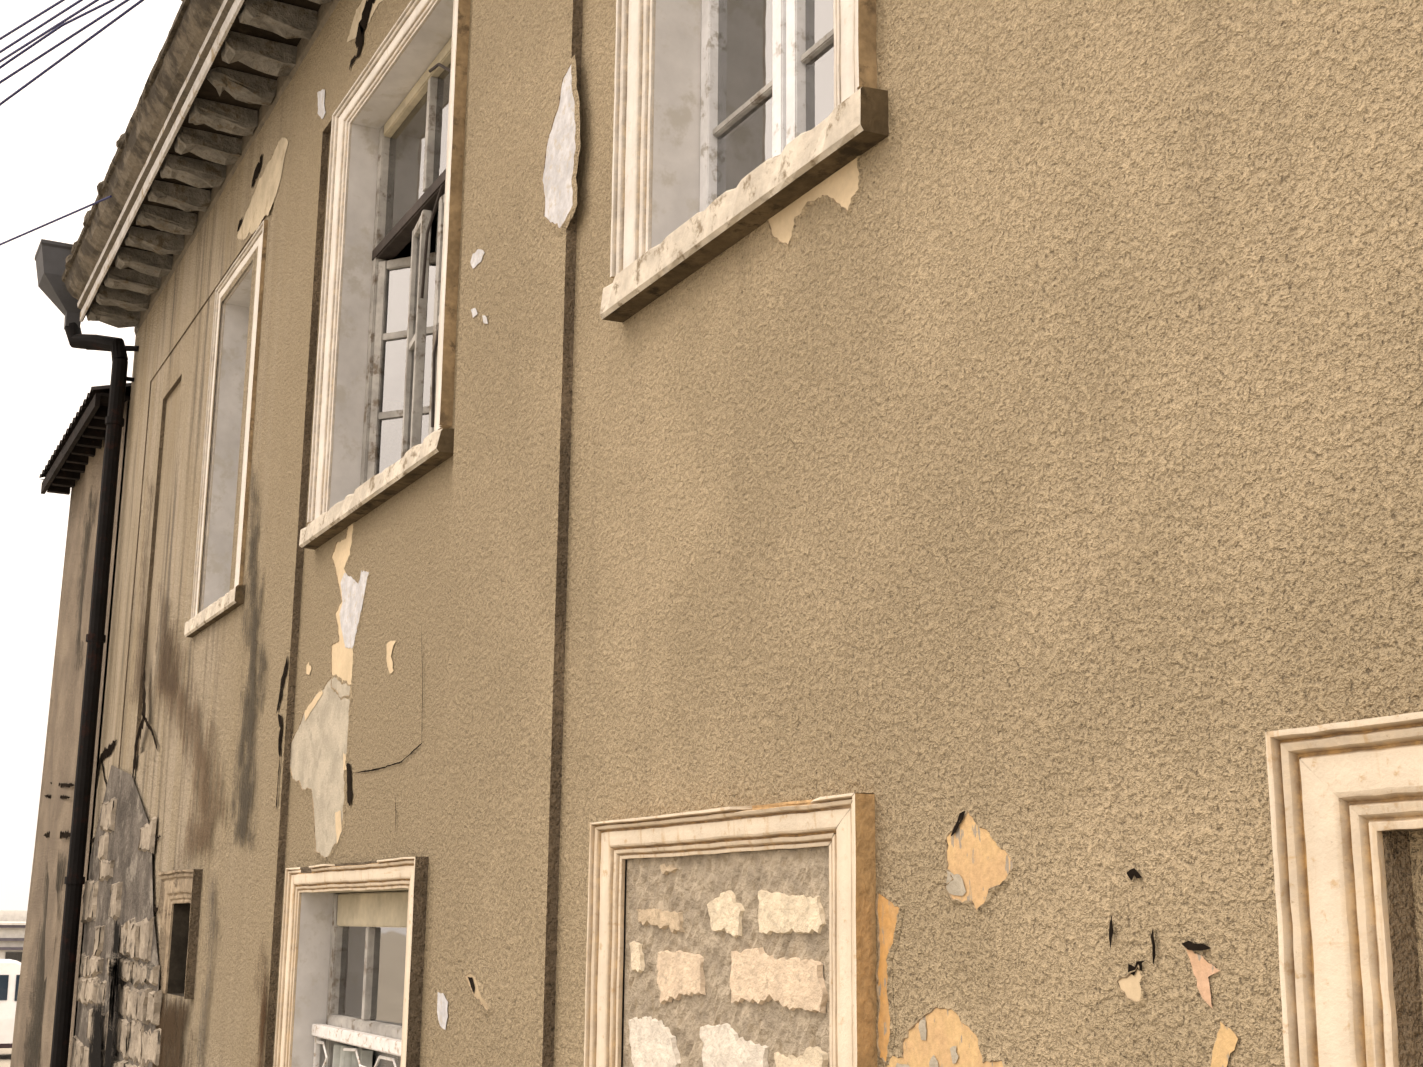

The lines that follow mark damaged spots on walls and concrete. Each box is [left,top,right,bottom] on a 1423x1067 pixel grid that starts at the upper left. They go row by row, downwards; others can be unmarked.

peeling [540,55,580,237]
peeling [766,155,863,250]
crack [44,660,158,844]
damp [134,477,266,863]
crack [276,658,287,808]
peeling [331,522,372,701]
peeling [943,804,1019,918]
peeling [875,887,1010,1067]
peeling [1115,960,1149,1009]
peeling [1186,949,1238,1067]